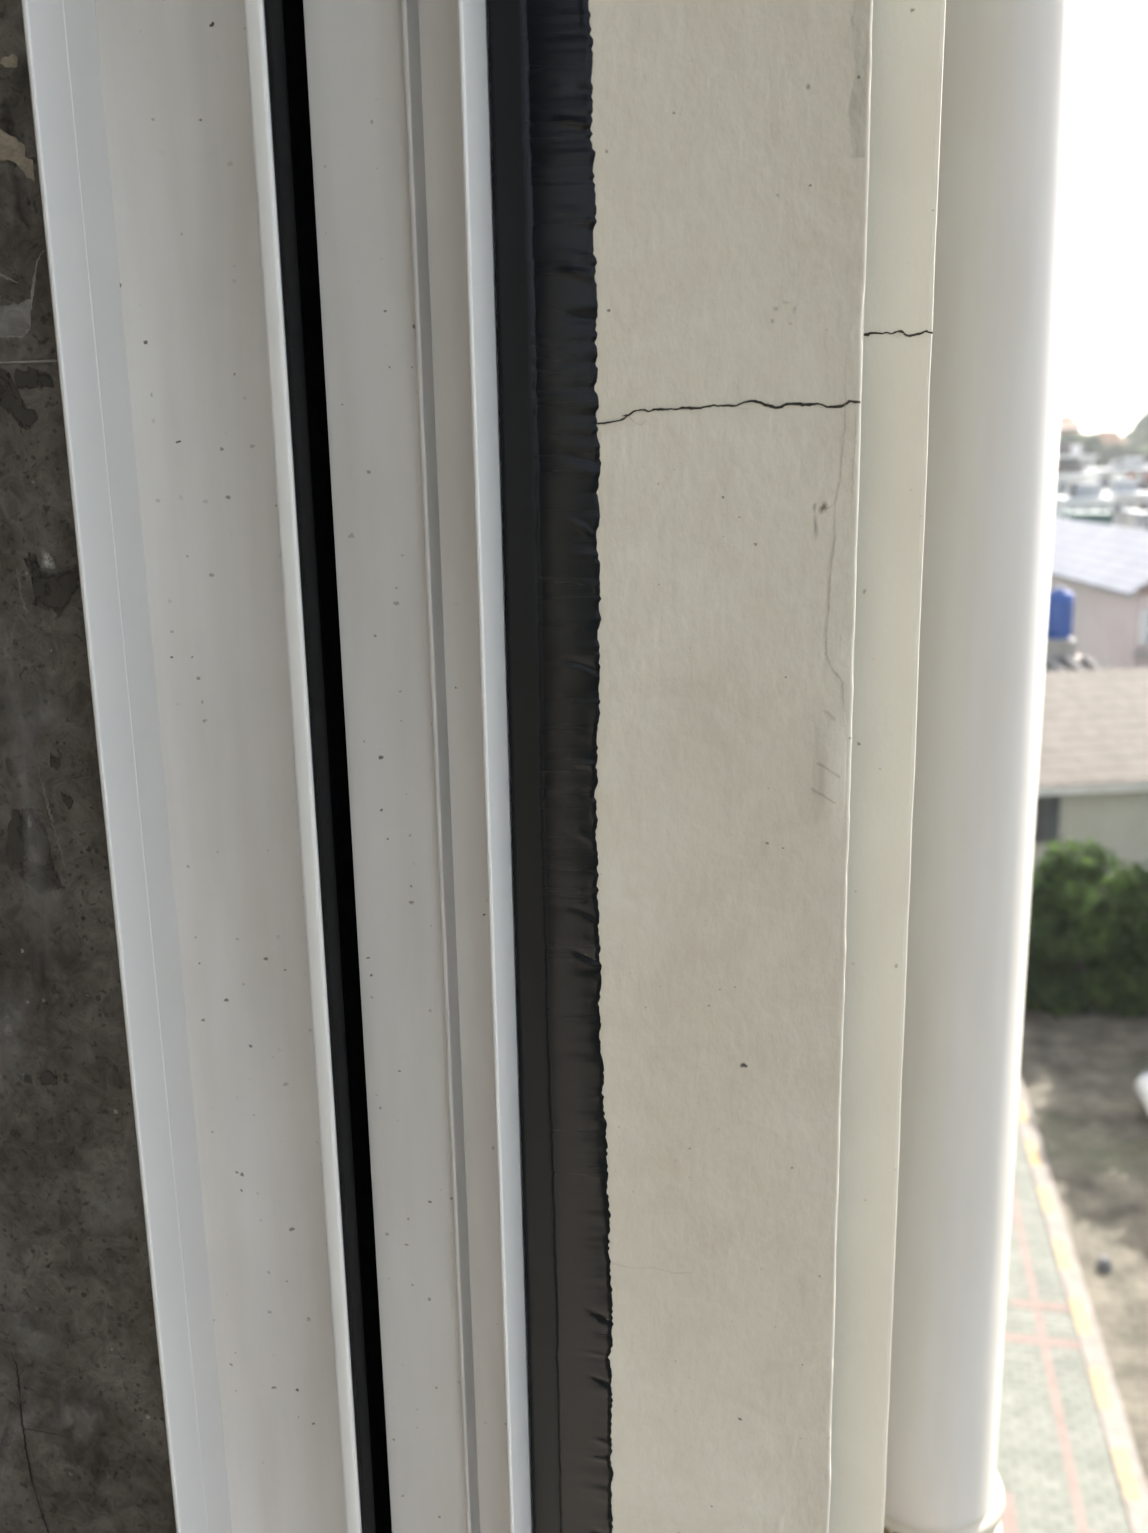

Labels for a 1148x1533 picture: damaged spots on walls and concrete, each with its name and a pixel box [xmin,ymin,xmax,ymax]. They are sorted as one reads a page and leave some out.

crack [596,330,933,725]